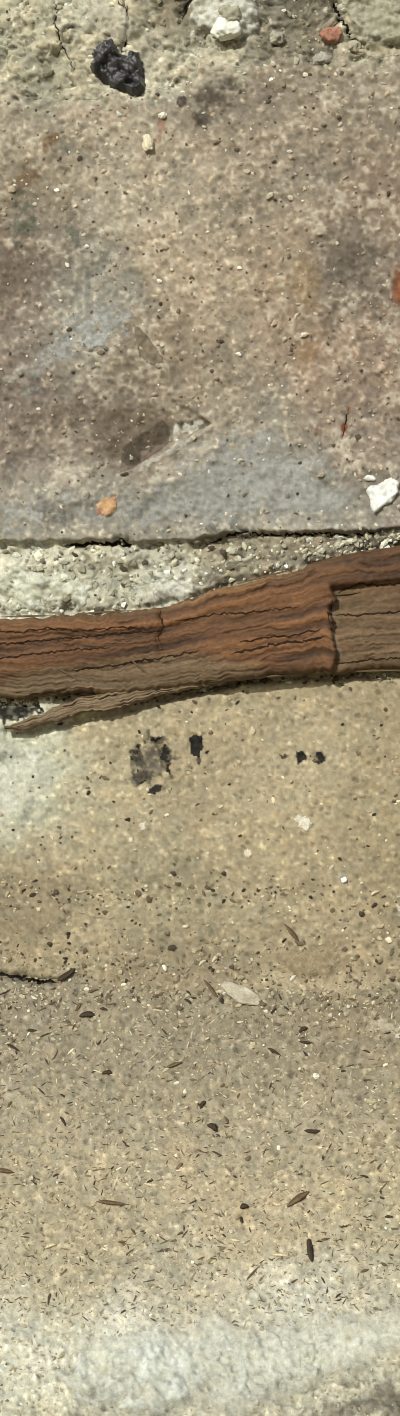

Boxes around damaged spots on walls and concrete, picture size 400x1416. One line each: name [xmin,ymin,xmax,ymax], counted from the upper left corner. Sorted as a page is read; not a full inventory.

crack [68,537,132,548]
crack [207,529,374,545]